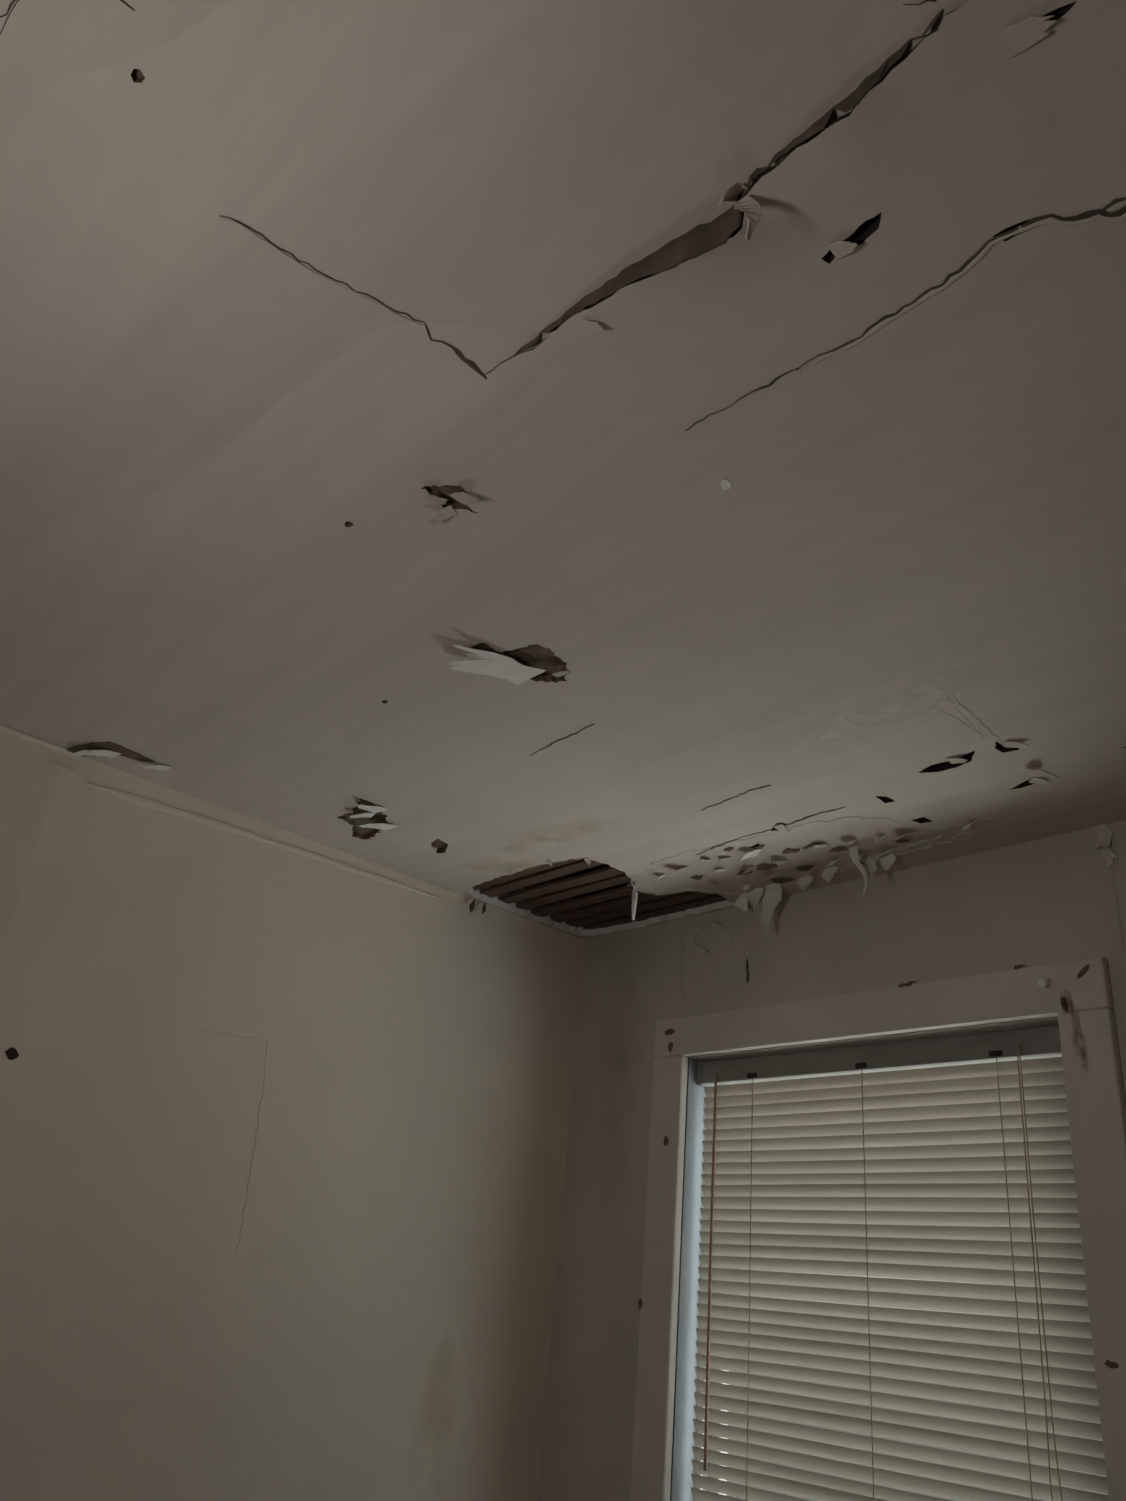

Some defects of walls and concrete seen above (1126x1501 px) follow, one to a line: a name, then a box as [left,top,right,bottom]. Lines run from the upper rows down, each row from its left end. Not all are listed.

crack [0,0,17,33]
crack [219,0,942,379]
crack [685,197,1126,431]
peeling [421,485,483,525]
peeling [445,643,571,685]
peeling [66,742,172,771]
peeling [337,799,398,840]
peeling [466,796,994,940]